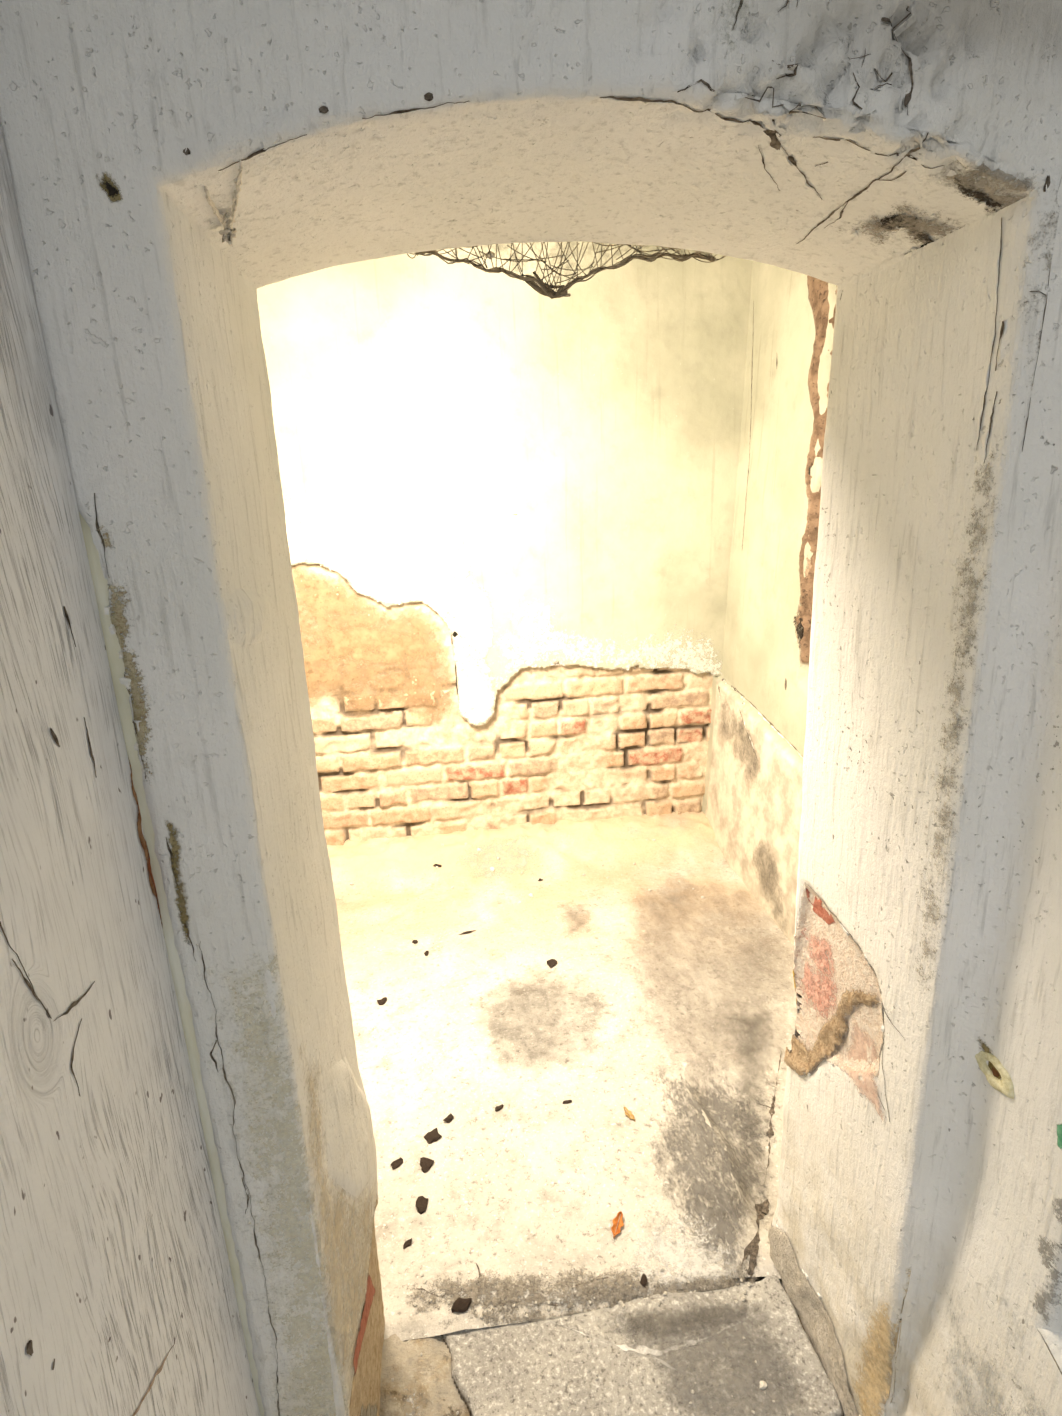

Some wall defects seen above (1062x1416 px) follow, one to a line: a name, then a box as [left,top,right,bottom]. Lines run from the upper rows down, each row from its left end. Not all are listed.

crack [725,0,743,32]
crack [758,0,928,244]
flaking render [793,275,837,664]
flaking render [284,496,713,846]
spalling [784,883,884,1119]
water stain [452,1285,610,1311]
water stain [627,1082,768,1295]